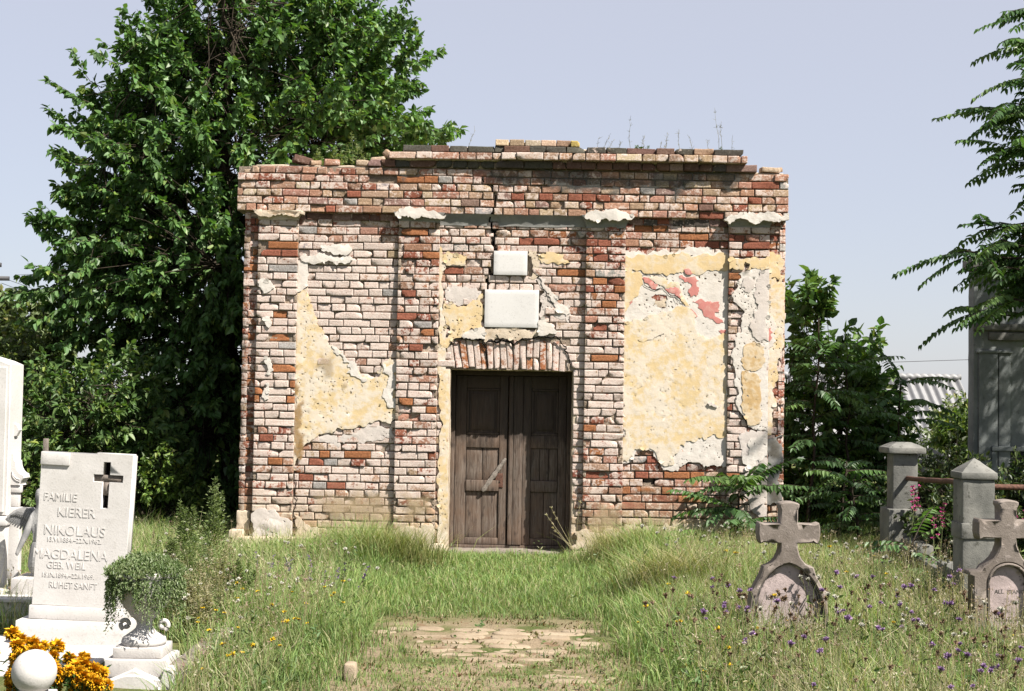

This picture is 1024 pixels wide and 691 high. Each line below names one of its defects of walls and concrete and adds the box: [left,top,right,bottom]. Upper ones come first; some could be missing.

peeling [258,278,275,293]
peeling [262,356,274,400]
peeling [294,244,396,470]
crack [481,177,498,289]
peeling [436,247,570,543]
peeling [623,246,785,485]